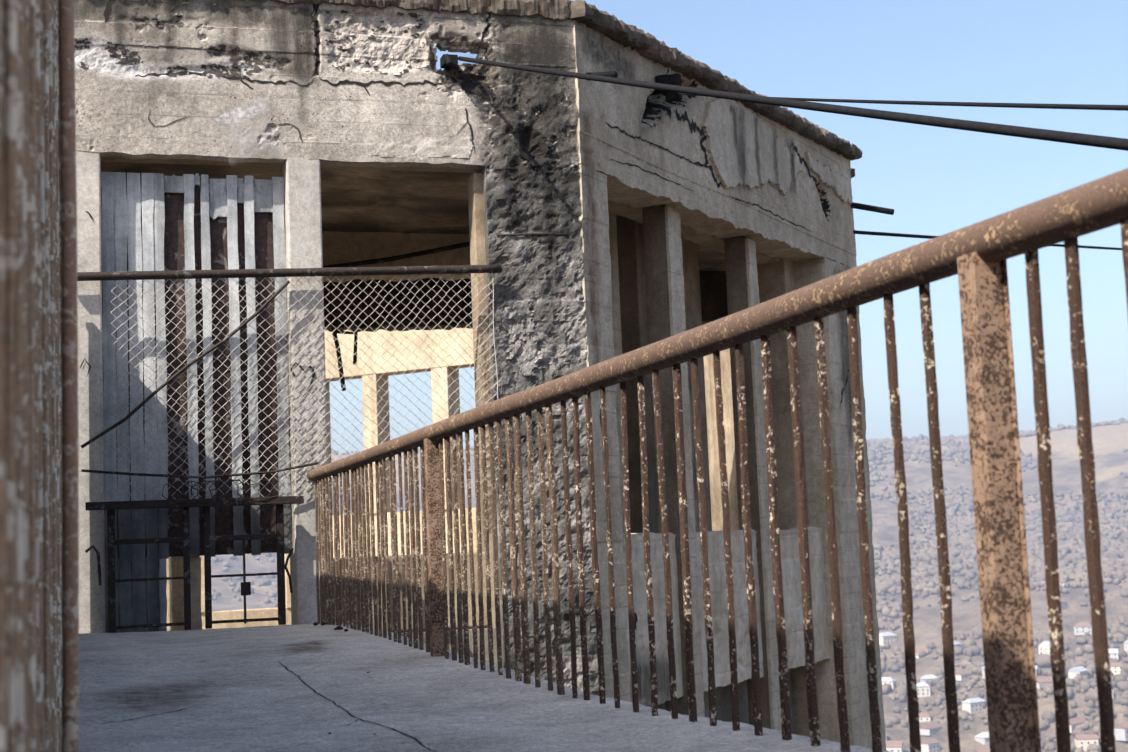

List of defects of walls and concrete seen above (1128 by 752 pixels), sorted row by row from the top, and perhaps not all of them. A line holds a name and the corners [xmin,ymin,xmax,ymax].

water stain [74,0,189,28]
water stain [205,0,313,76]
crack [135,3,444,96]
spalling [323,6,499,95]
crack [478,12,491,50]
crack [148,113,190,127]
crack [456,108,475,151]
crack [606,104,830,232]
peeling [641,79,853,221]
crack [281,664,443,752]